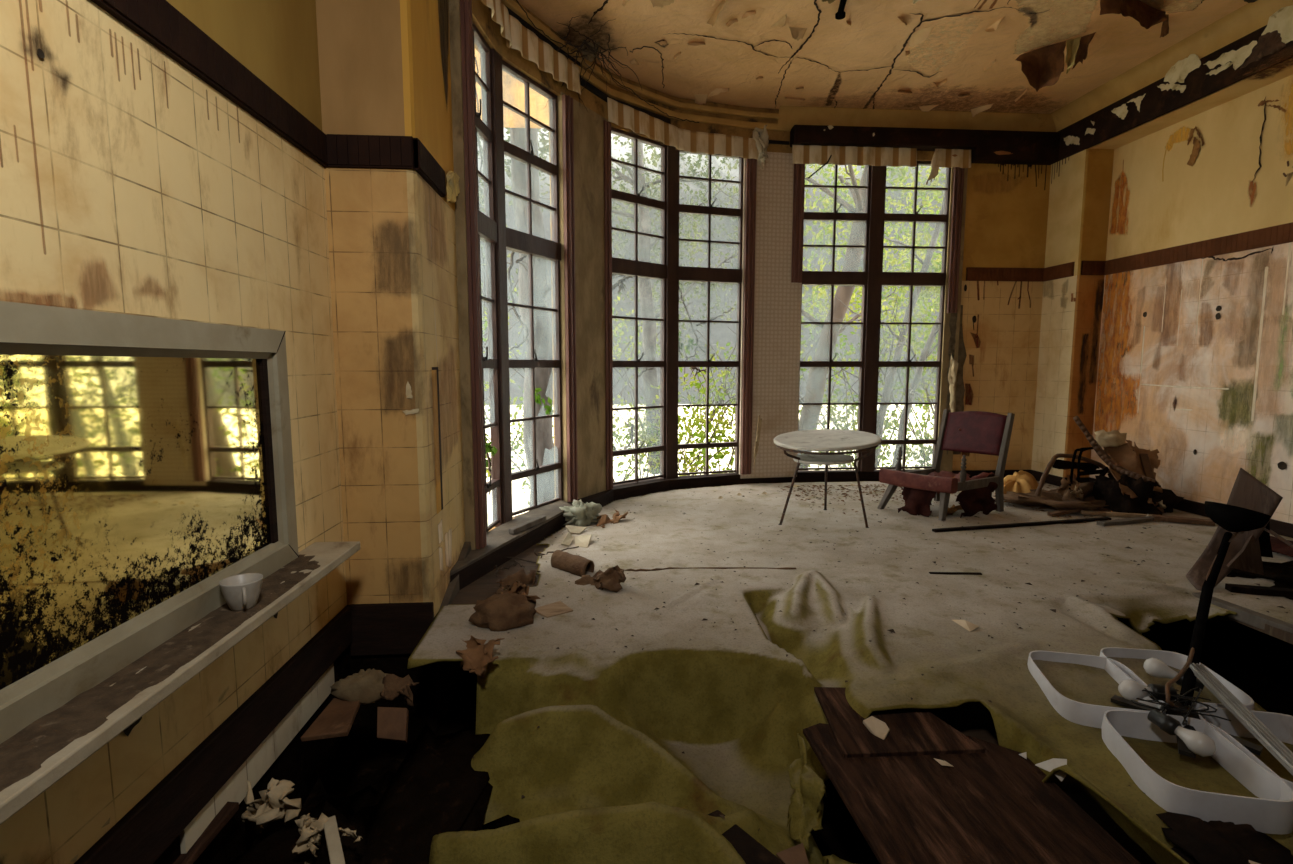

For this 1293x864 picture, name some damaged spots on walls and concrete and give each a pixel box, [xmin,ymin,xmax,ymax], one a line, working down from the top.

water stain [66,0,80,43]
water stain [109,29,141,90]
crack [588,0,608,24]
crack [673,0,1020,109]
peeling [897,17,934,56]
flaking render [1014,0,1169,102]
peeling [1111,5,1293,119]
water stain [0,0,46,255]
water stain [0,261,114,310]
water stain [140,278,166,297]
water stain [1131,242,1293,455]